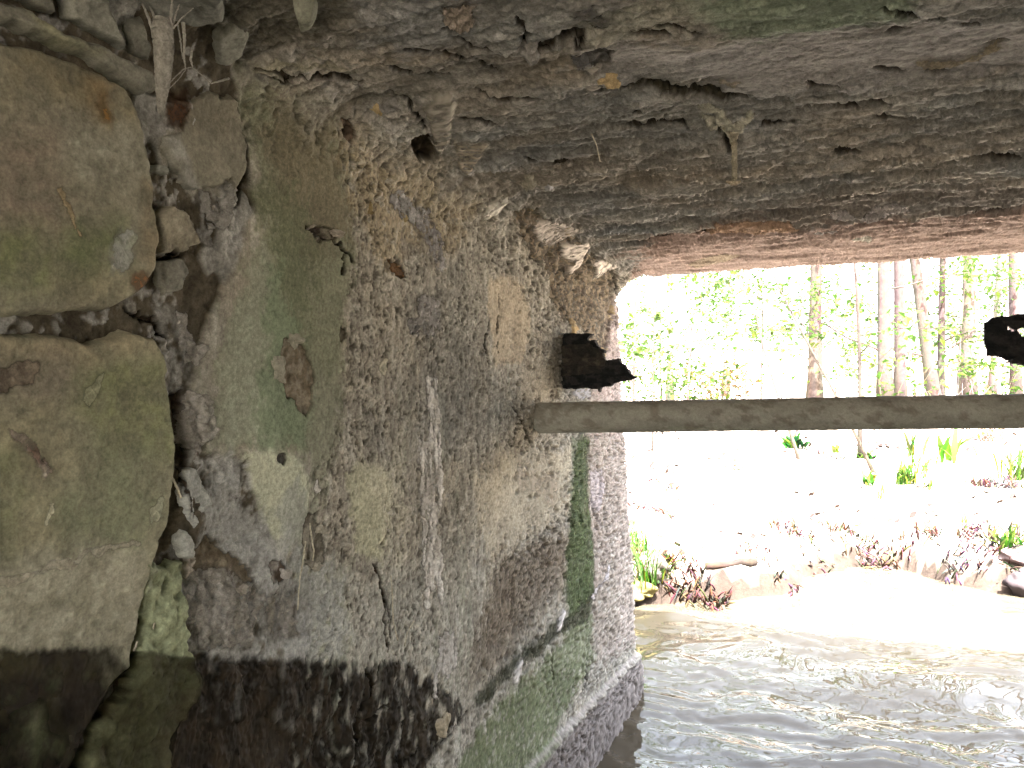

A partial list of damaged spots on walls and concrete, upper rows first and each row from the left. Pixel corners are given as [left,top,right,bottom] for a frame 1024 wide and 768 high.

spalling [410,134,437,159]
crack [334,242,352,275]
spalling [271,333,314,416]
damp [589,469,605,511]
crack [372,565,389,646]
damp [0,631,462,768]